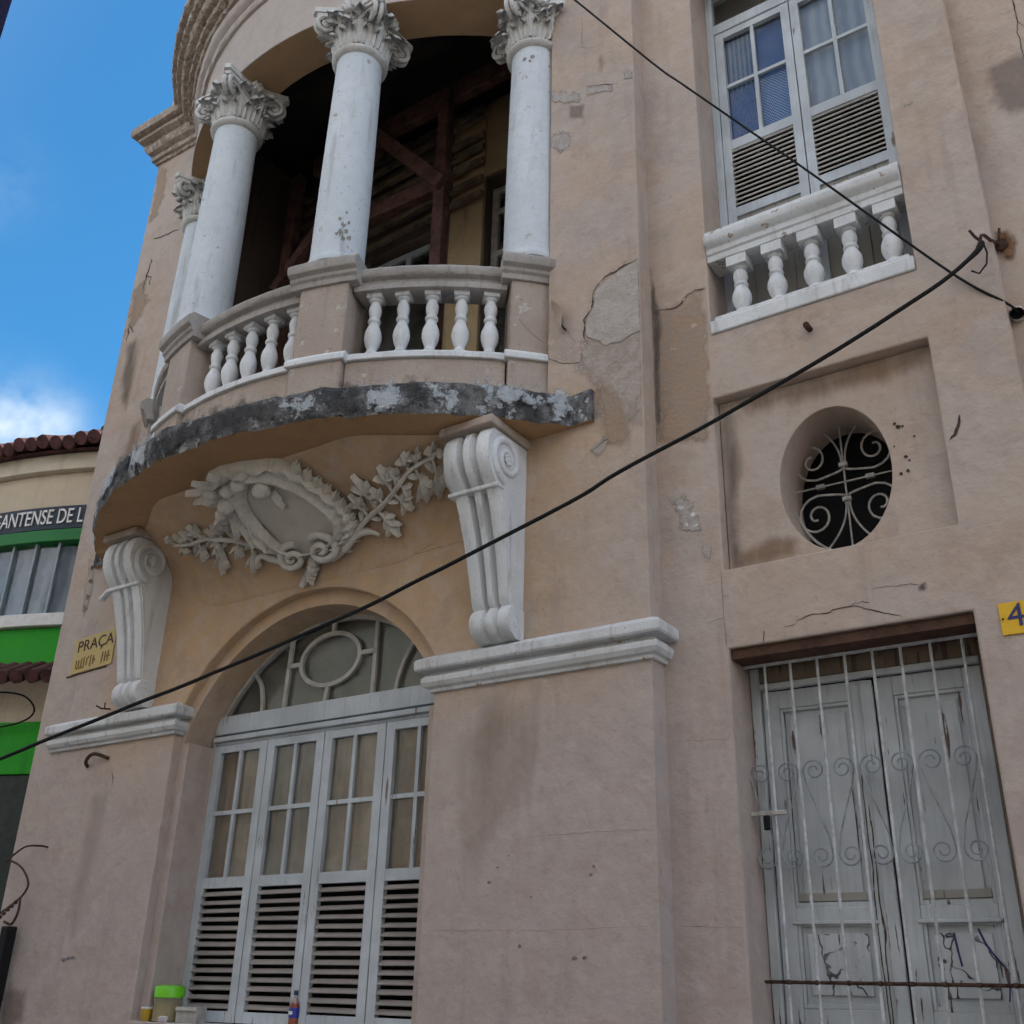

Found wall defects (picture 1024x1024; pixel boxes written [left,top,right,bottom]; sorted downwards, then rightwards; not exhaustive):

crack [1012,0,1024,57]
crack [143,230,178,289]
rust [997,232,1016,259]
peeling [547,259,642,423]
damp [406,380,427,401]
damp [151,399,279,457]
damp [116,457,128,482]
crack [763,601,902,642]